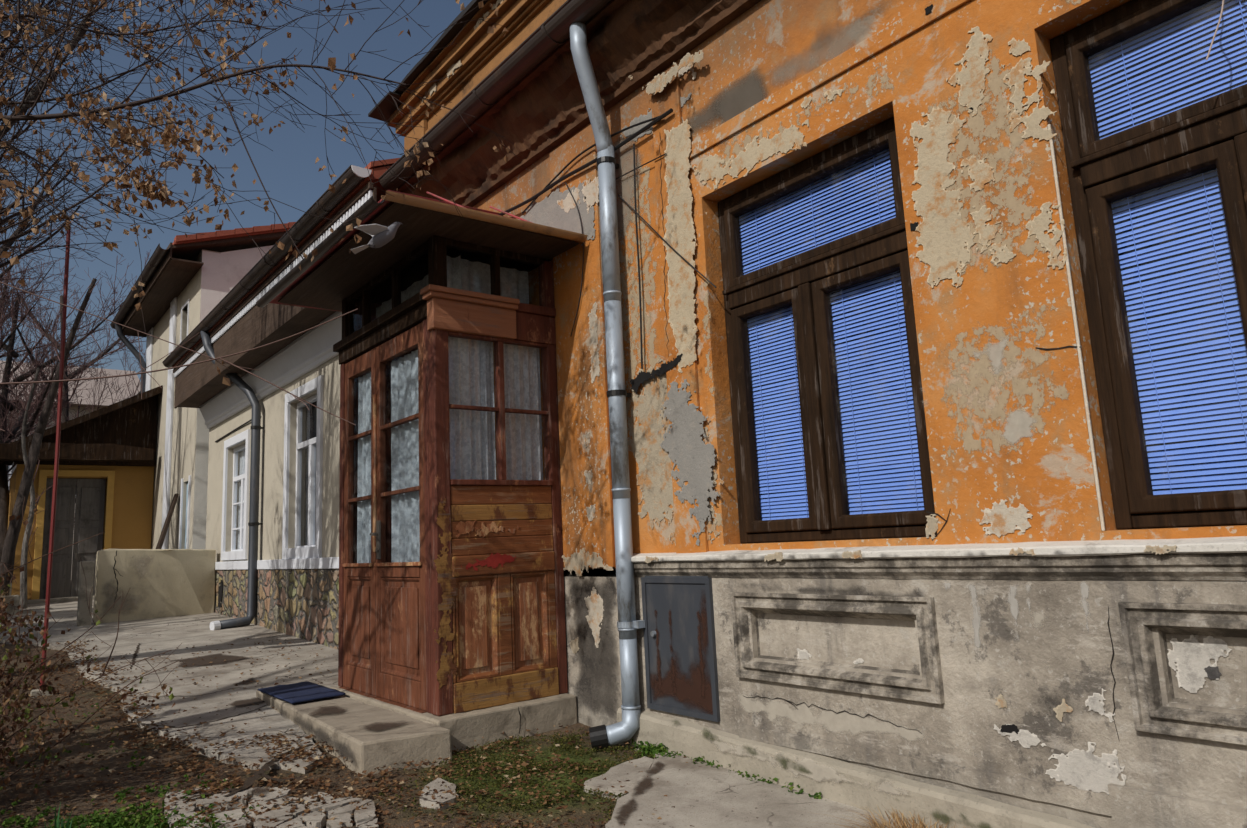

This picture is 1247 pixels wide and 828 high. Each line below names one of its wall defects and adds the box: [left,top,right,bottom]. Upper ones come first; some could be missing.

damp [688,71,766,132]
flaking render [910,26,1057,288]
flaking render [1026,202,1067,269]
flaking render [620,50,843,546]
flaking render [979,499,1033,538]
peeling [434,498,519,689]
corrosion [650,599,713,715]
peeling [1167,635,1232,693]
peeling [994,724,1127,795]